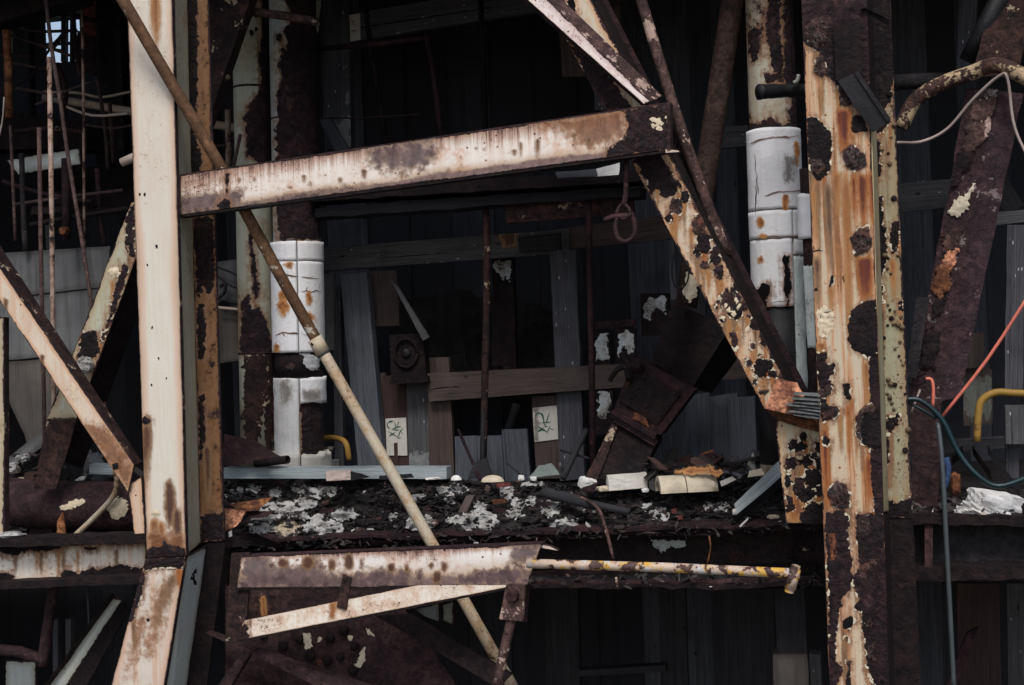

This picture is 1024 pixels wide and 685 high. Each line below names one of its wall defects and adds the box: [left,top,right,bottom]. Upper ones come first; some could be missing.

rust [243,0,319,163]
rust [260,138,438,242]
rust [530,39,779,406]
peeling [643,295,667,321]
peeling [682,272,699,303]
peeling [719,298,741,321]
rust [747,0,913,685]
peeling [9,452,40,479]
peeling [60,449,114,481]
rust [0,478,198,674]
rust [200,497,541,640]
peeling [224,453,825,590]